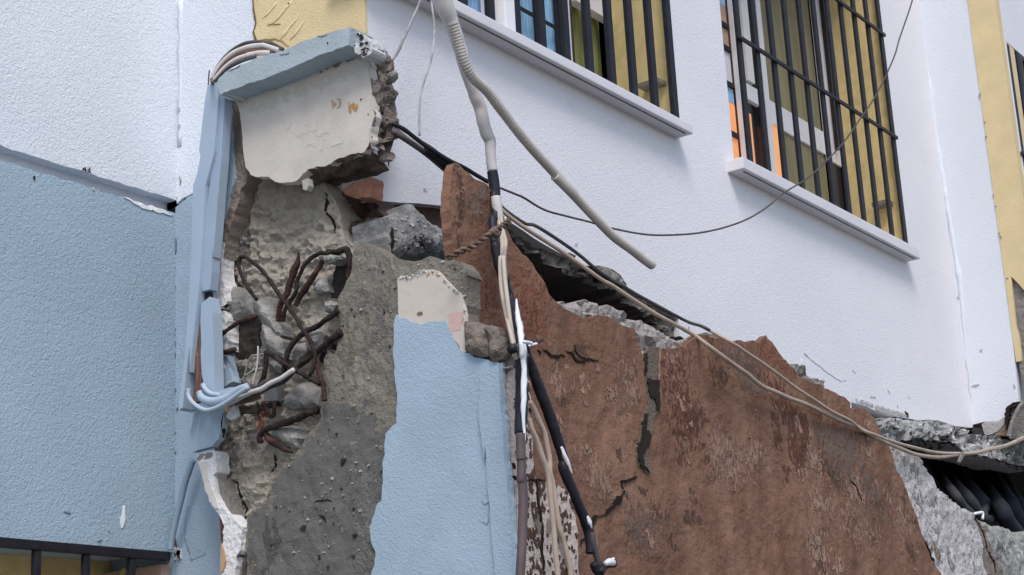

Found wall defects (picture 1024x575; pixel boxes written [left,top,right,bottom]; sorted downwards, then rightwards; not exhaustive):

spalling [196,100,488,575]
crack [537,345,597,363]
crack [580,346,662,545]
spalling [909,406,1024,466]
spalling [895,464,979,574]